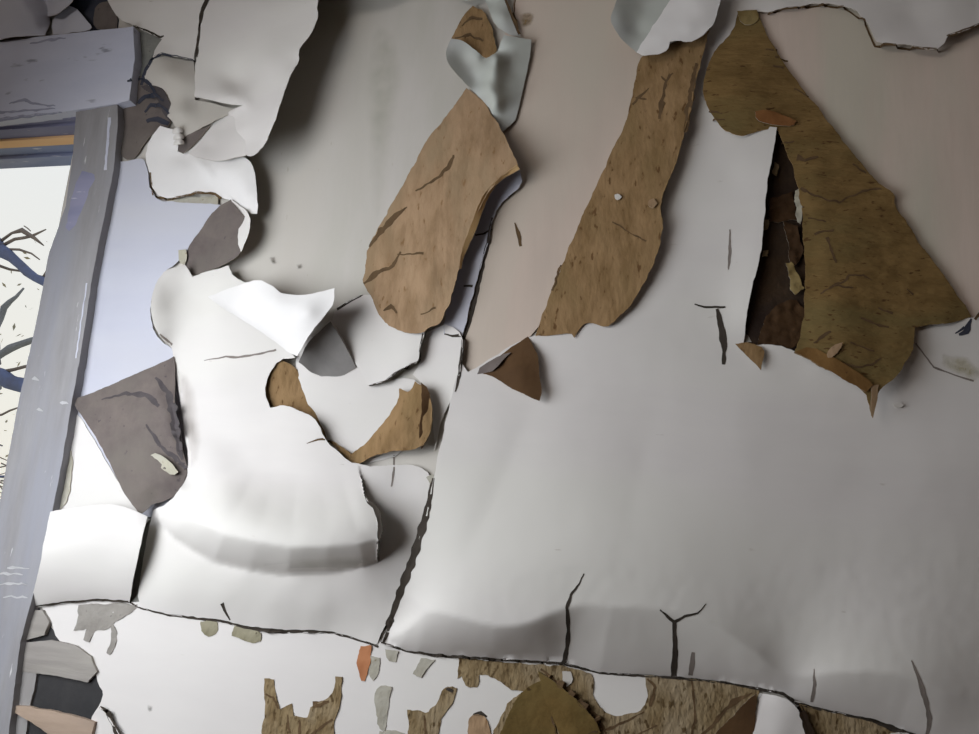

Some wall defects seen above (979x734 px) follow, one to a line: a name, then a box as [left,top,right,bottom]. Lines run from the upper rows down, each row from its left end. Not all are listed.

peeling [0,0,92,40]
crack [134,0,208,86]
crack [768,3,979,53]
peeling [33,0,805,734]
peeling [385,0,979,734]
crack [36,478,932,734]